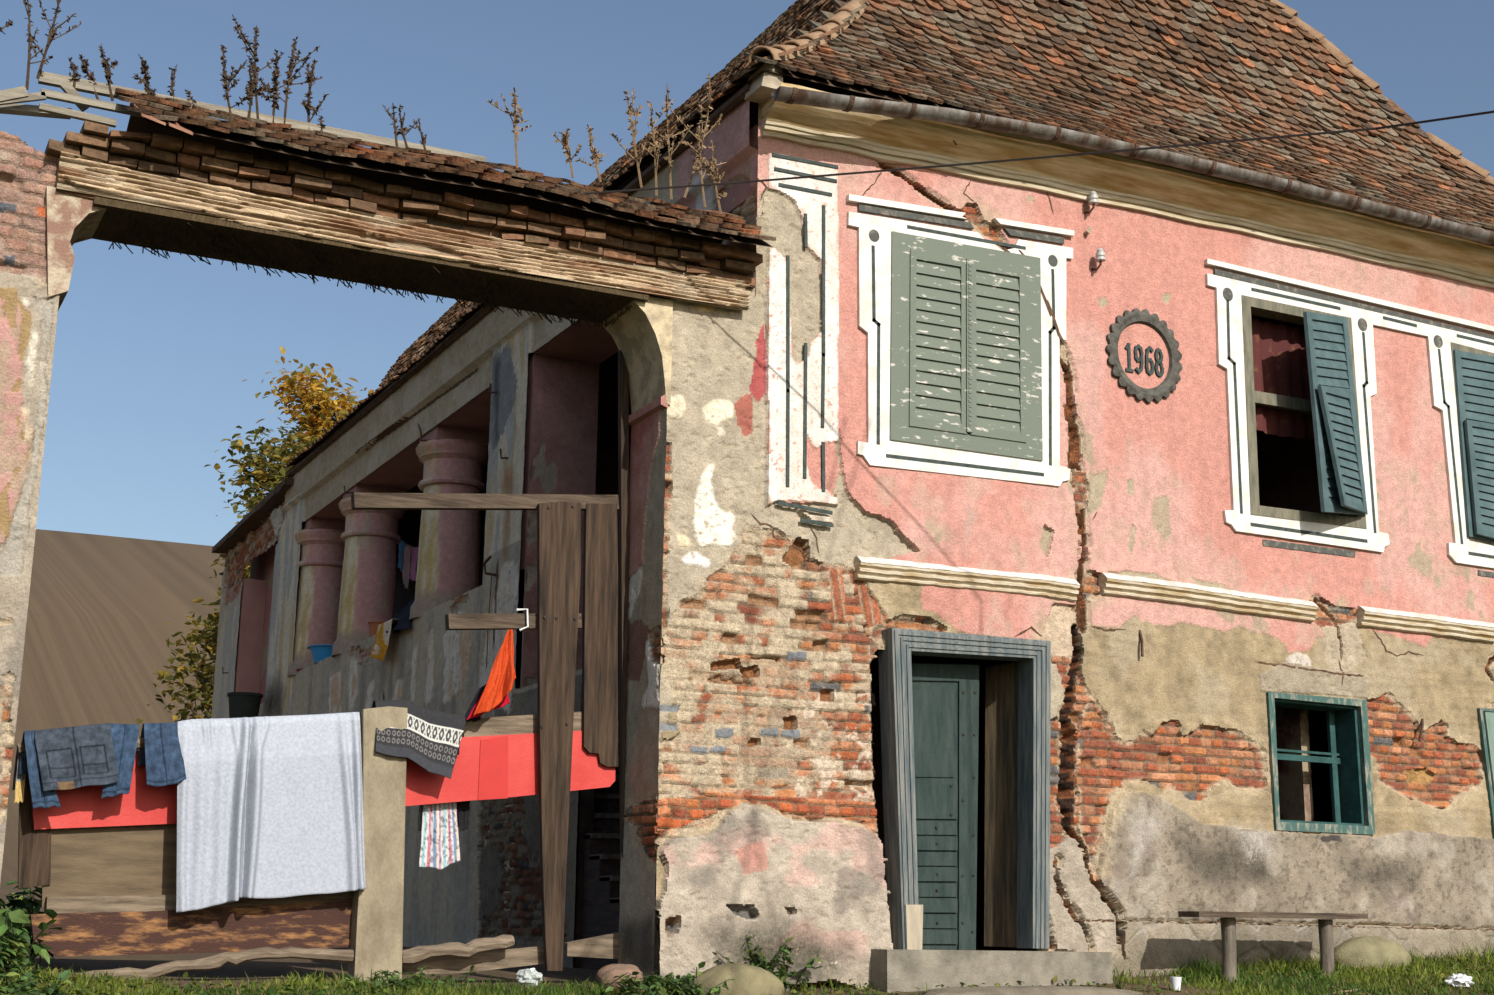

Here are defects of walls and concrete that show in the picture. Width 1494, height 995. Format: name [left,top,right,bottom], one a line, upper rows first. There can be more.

crack [862,162,1024,255]
flaking render [0,131,59,576]
flaking render [220,500,285,609]
peeling [326,558,537,714]
flaking render [621,165,948,863]
crack [1015,287,1494,959]
flaking render [0,671,17,825]
crack [869,657,877,791]
flaking render [1039,523,1268,951]
flaking render [1366,691,1484,810]